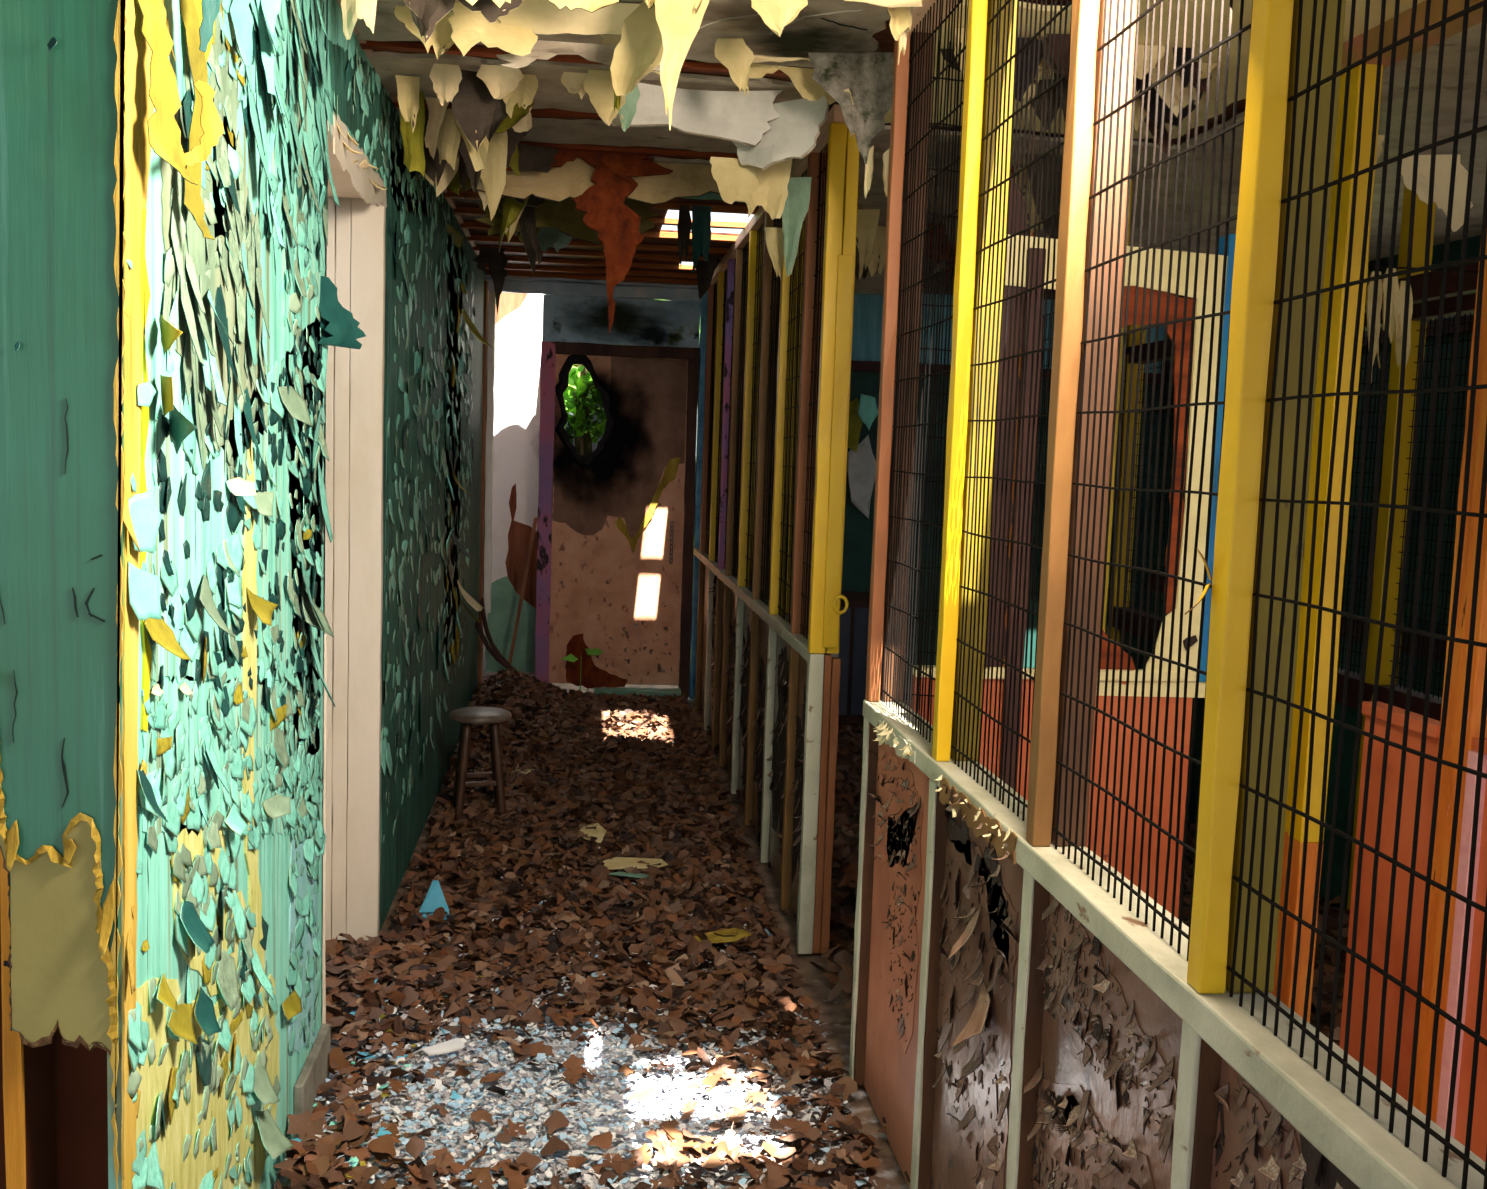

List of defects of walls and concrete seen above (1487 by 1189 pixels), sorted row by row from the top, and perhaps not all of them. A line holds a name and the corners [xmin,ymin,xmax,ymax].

water stain [575,302,676,344]
peeling [0,0,493,1189]
peeling [859,720,1177,1189]
flaking render [445,1048,516,1143]
peeling [1211,1083,1360,1189]